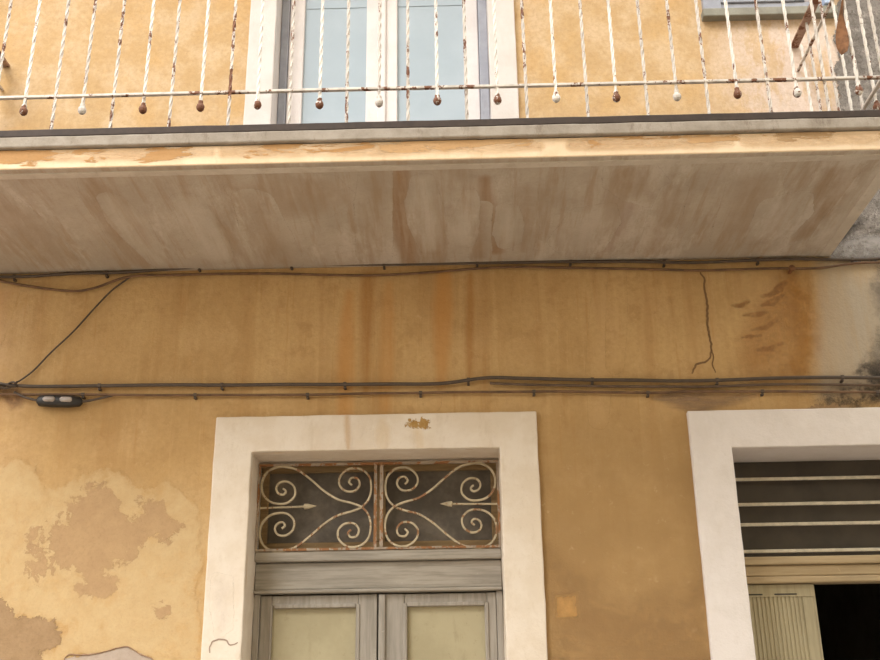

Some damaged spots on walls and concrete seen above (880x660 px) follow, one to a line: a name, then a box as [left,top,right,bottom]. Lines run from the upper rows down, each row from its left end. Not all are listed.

peeling [0,149,106,166]
peeling [134,147,193,163]
peeling [0,281,21,347]
crack [692,272,716,374]
water stain [710,162,880,409]
peeling [0,457,205,660]